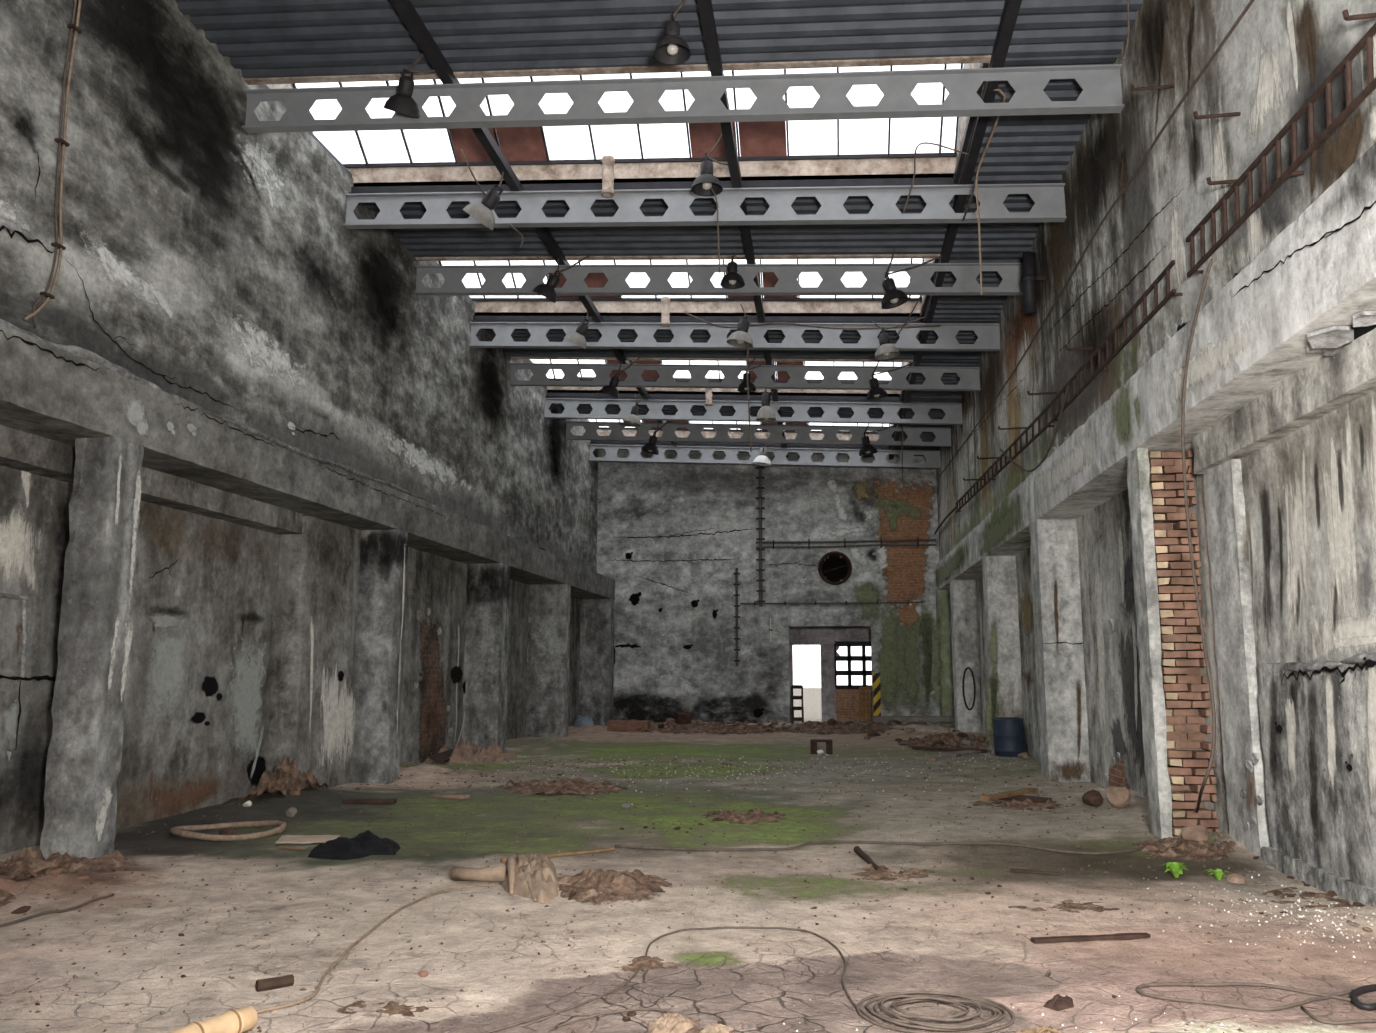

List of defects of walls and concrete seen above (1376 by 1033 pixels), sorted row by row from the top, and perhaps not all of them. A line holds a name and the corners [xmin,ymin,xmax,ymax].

crack [34,151,42,200]
leakage [145,146,189,191]
leakage [210,122,285,208]
crack [1224,201,1376,297]
crack [0,225,445,518]
spalling [867,458,939,632]
leakage [1278,399,1376,798]
spalling [1286,653,1376,672]
crack [0,674,56,748]
leakage [1270,676,1336,830]